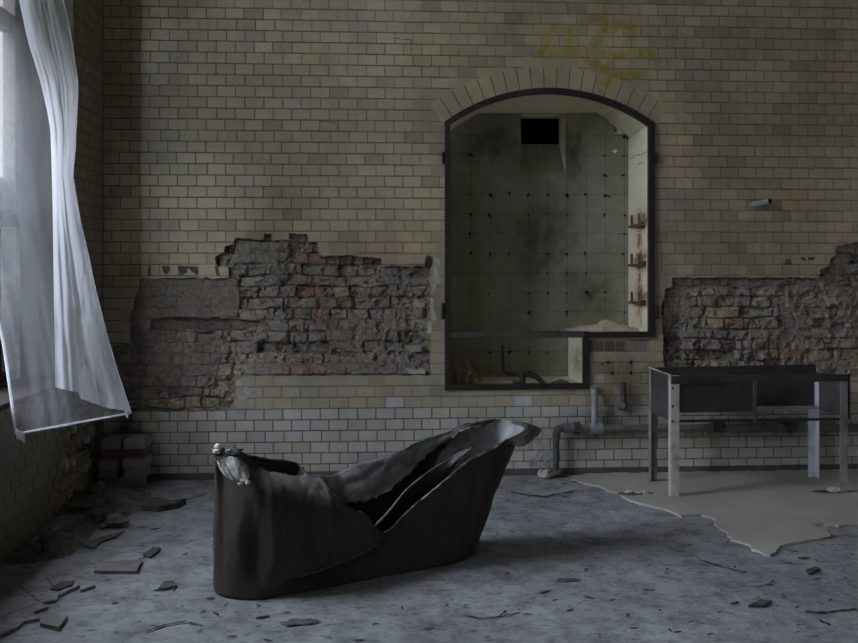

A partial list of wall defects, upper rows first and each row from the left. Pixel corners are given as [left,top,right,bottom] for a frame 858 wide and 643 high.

spalling [112,233,441,411]
spalling [658,242,858,376]